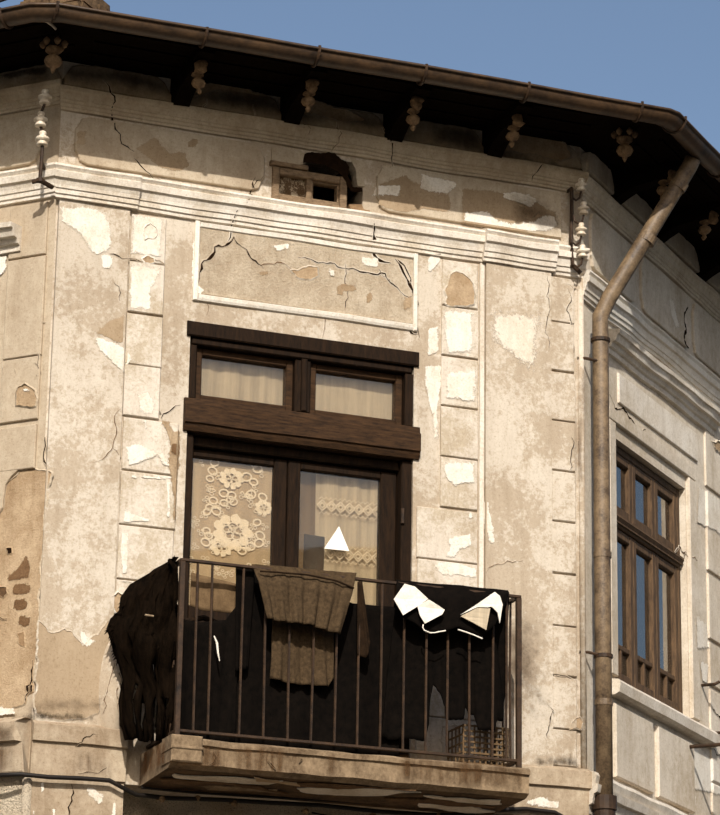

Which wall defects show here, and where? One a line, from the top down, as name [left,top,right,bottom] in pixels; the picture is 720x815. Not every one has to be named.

crack [102,79,175,182]
flaking render [136,138,198,172]
peeling [60,206,113,268]
peeling [128,214,162,310]
crack [198,176,420,338]
flaking render [372,174,558,234]
peeling [425,270,477,439]
peeling [491,309,541,371]
peeling [126,420,181,520]
flaking render [0,468,123,722]
crack [75,733,97,747]
crack [67,768,106,815]